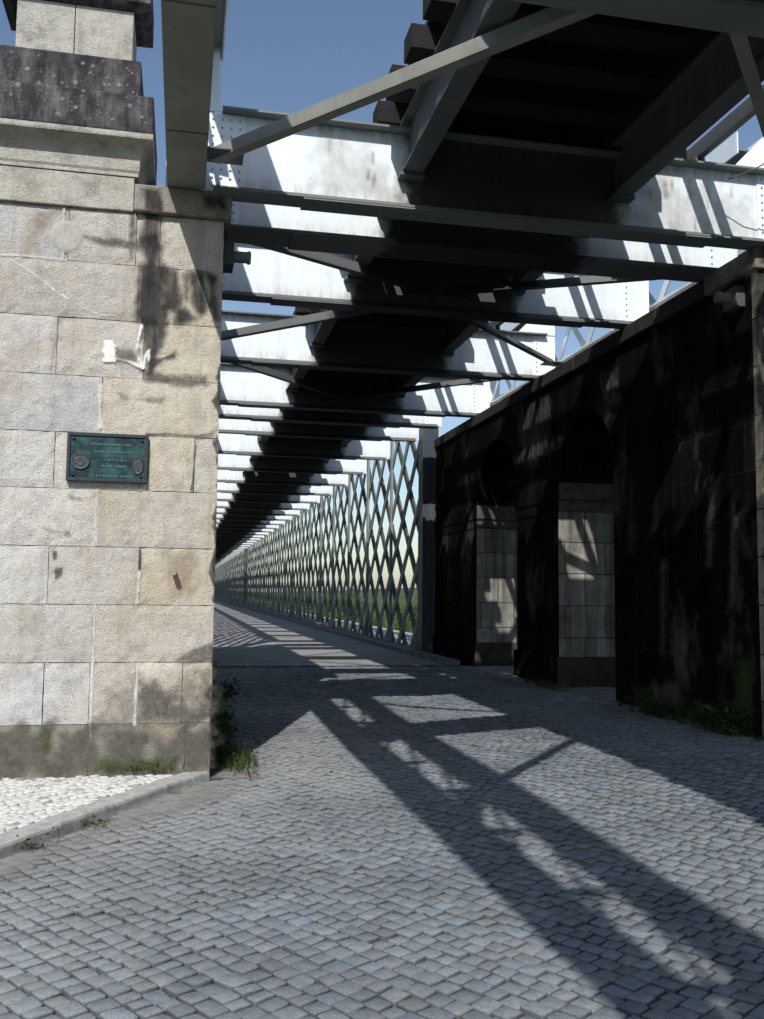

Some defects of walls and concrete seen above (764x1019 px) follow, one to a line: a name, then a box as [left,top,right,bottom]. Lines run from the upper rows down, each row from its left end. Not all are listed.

water stain [93,189,217,386]